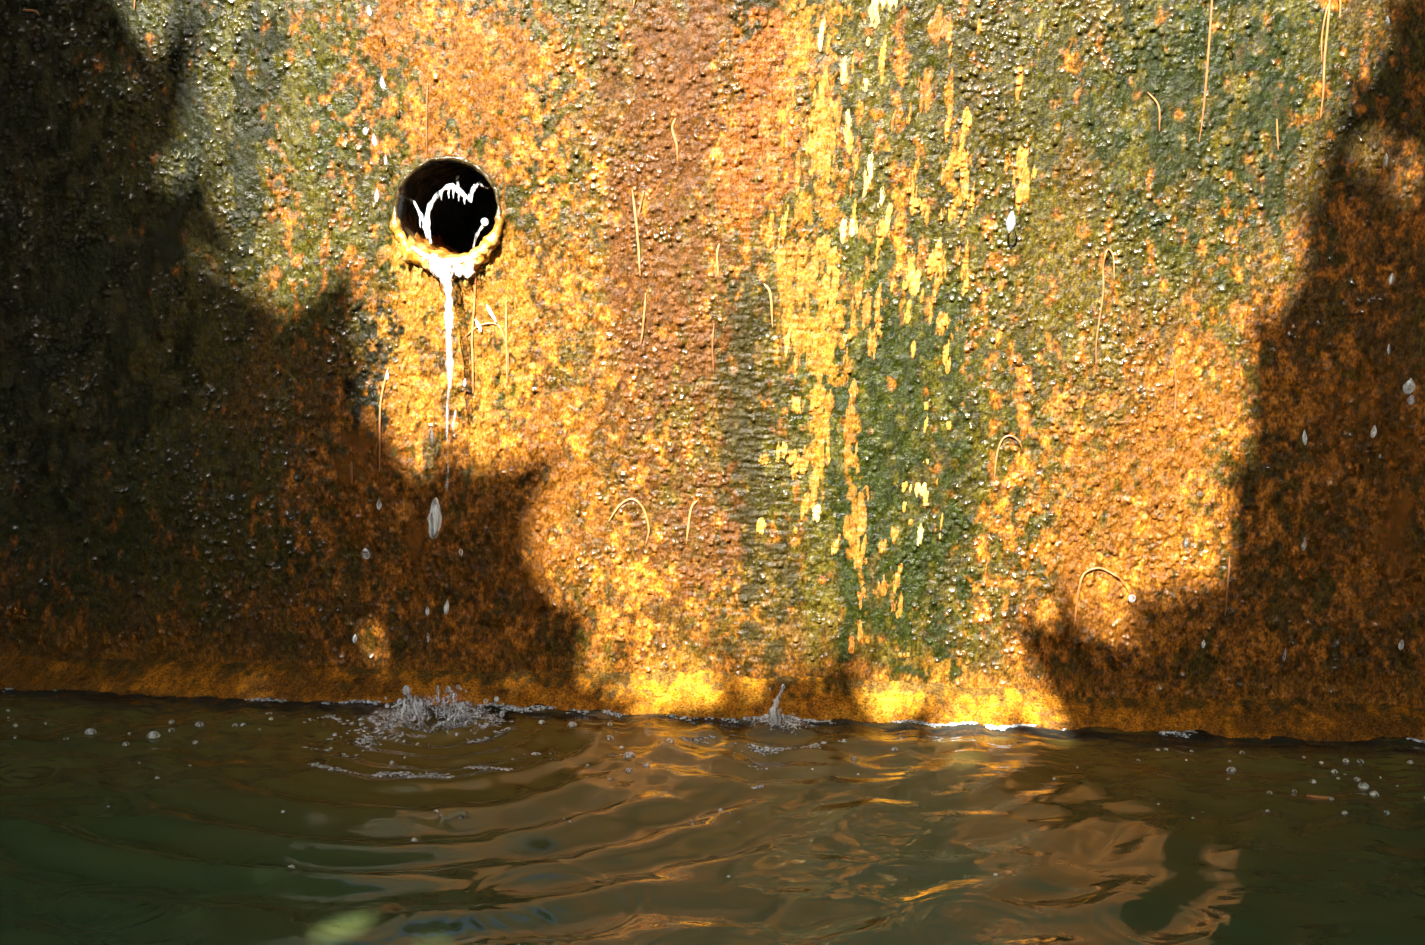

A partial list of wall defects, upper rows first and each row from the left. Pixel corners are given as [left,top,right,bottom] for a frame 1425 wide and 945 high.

water stain [160,0,285,285]
rust [714,0,860,478]
rust [892,172,905,262]
rust [945,85,962,206]
rust [313,229,616,630]
rust [844,451,864,585]
water stain [835,439,971,674]
rust [1016,321,1233,670]